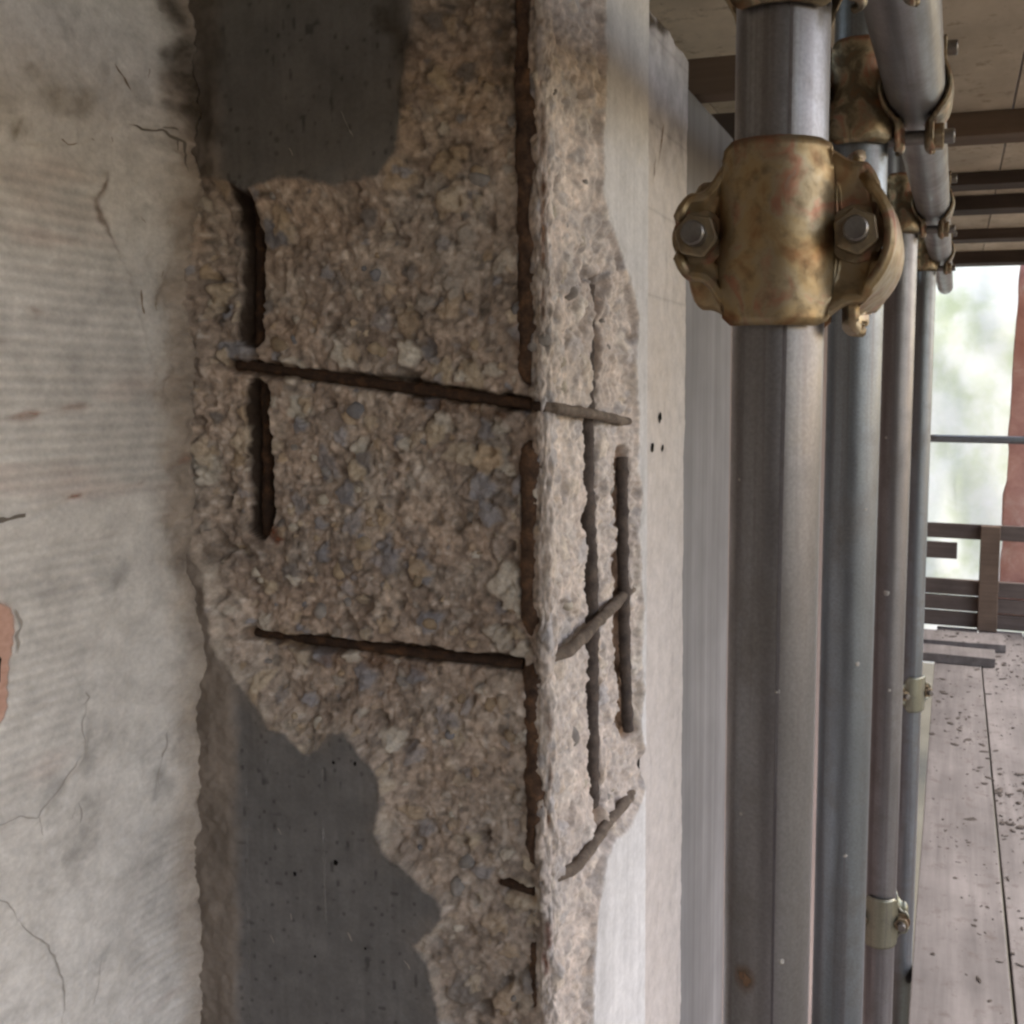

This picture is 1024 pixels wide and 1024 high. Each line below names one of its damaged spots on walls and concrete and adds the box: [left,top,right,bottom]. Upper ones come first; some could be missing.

crack [61,124,188,169]
spalling [182,0,664,1024]
crack [0,692,90,835]